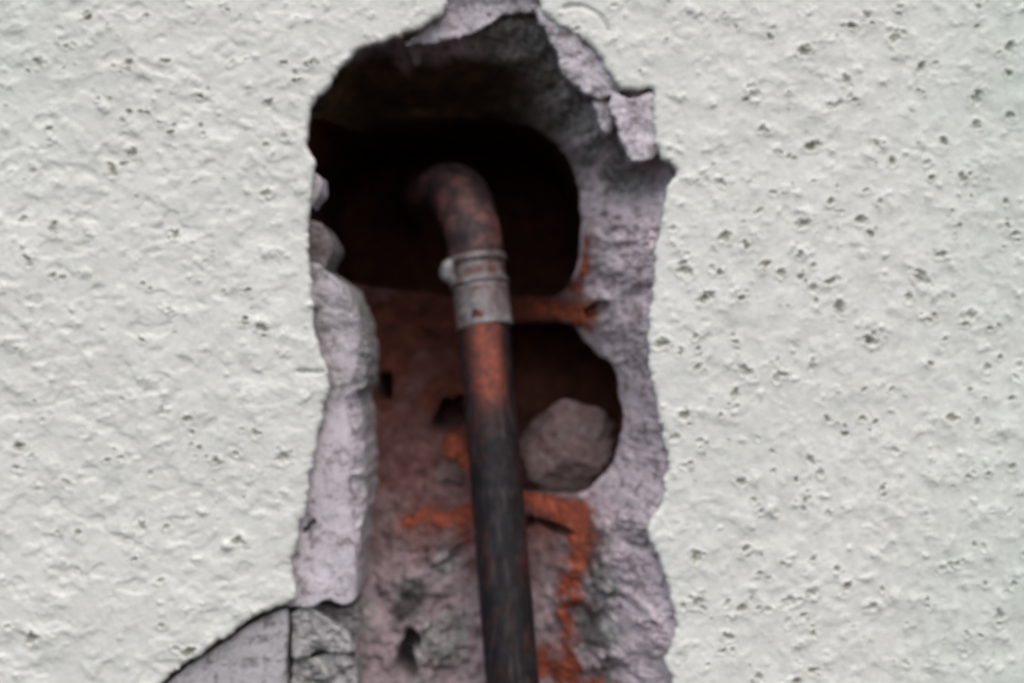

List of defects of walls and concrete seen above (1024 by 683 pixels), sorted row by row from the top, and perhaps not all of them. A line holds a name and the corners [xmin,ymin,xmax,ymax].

spalling [311,0,676,683]
spalling [163,172,485,683]
corrosion [445,433,469,472]
corrosion [402,503,474,543]
crack [289,610,356,681]